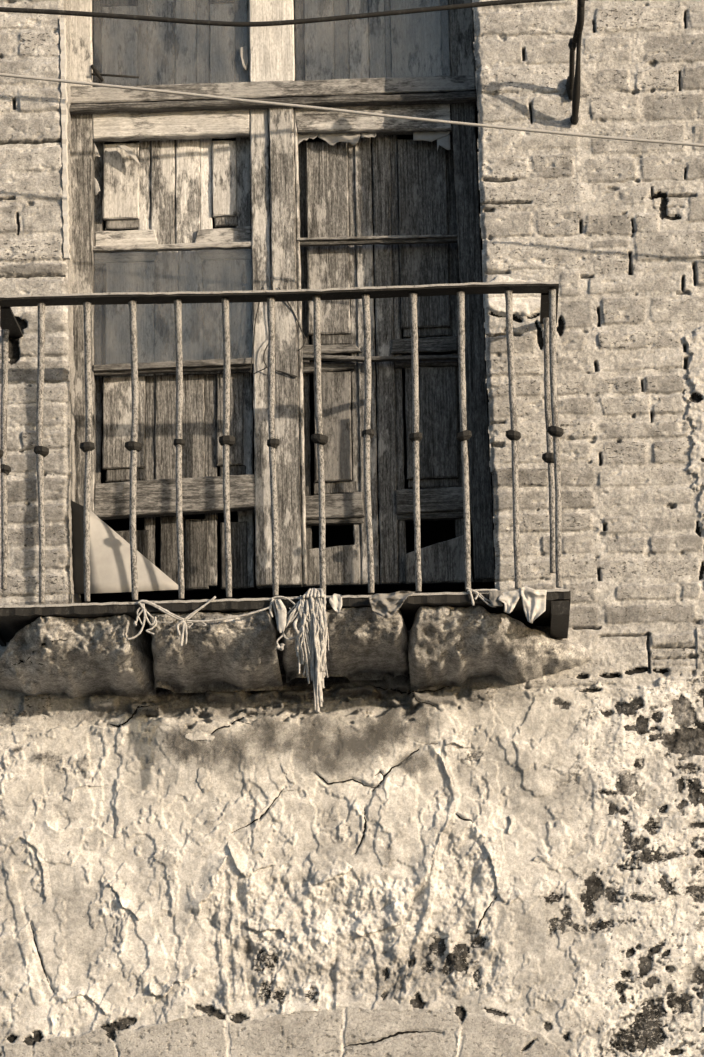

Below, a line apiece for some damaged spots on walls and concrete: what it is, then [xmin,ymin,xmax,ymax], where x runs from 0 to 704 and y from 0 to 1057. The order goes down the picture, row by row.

spalling [576,667,669,693]
crack [232,788,284,833]
leakage [167,709,430,774]
crack [315,743,438,854]
flaking render [599,671,704,871]
crack [467,897,497,934]
flaking render [543,872,616,935]
flaking render [630,876,704,902]
crack [30,923,53,990]
flaking render [610,944,704,1055]
flaking render [7,1031,43,1046]
crack [344,1031,440,1048]